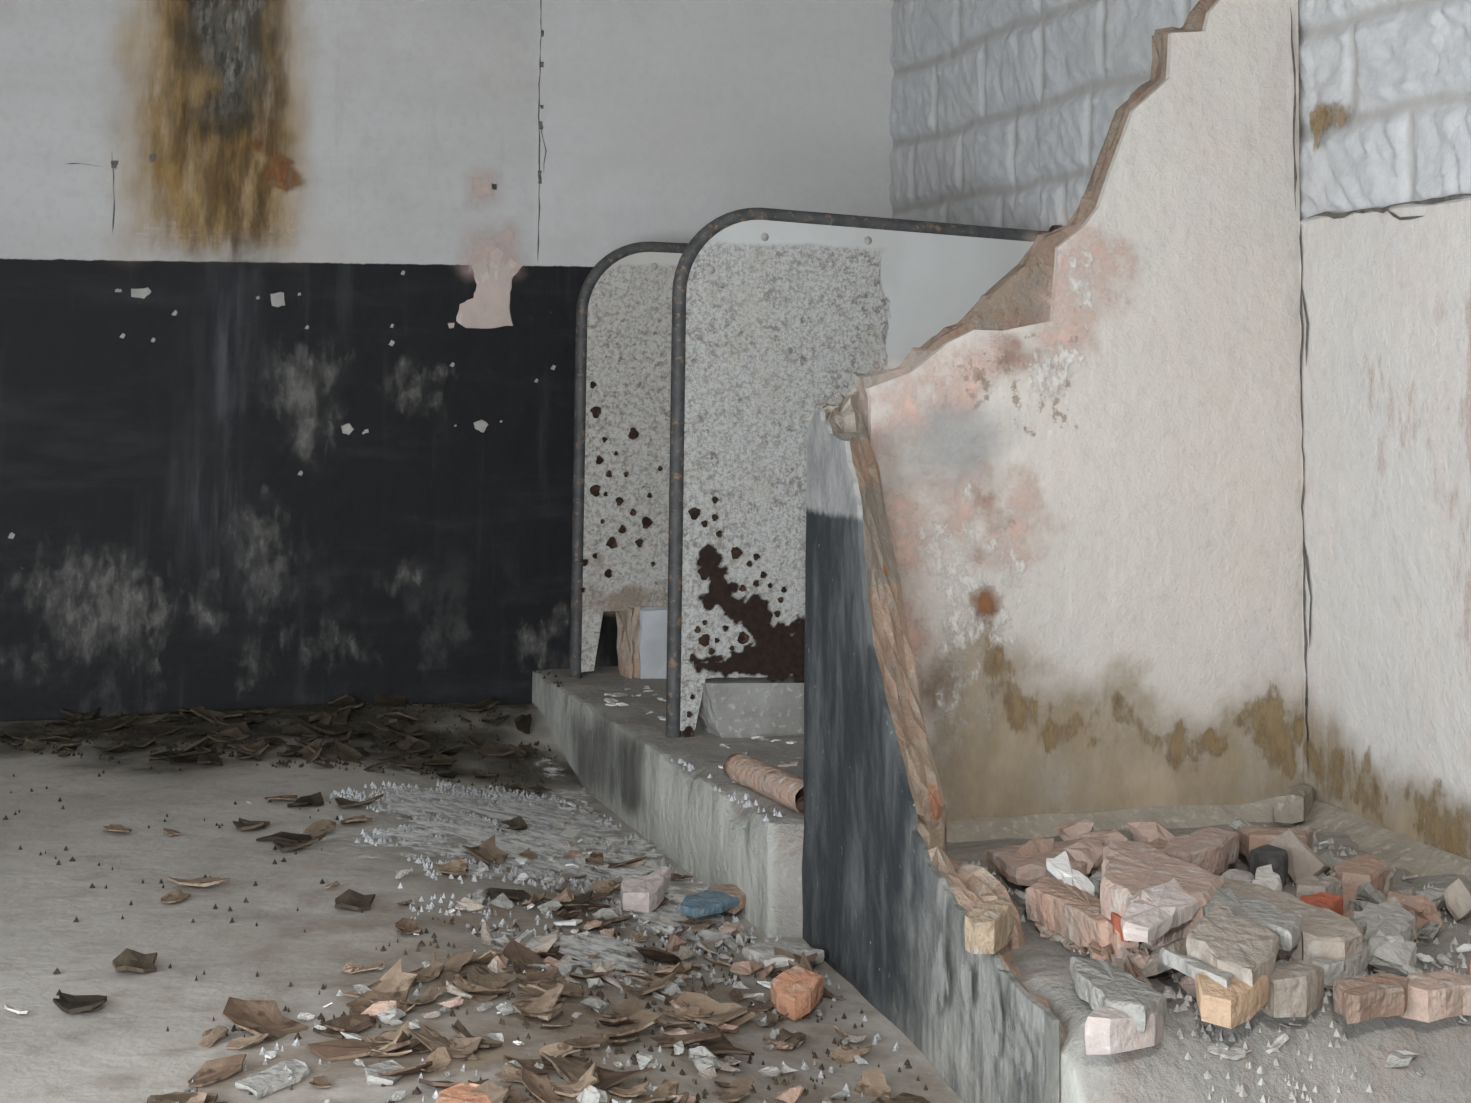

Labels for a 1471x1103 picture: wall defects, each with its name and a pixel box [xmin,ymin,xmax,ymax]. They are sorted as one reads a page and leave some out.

corrosion [144,0,301,249]
peeling [115,287,151,299]
peeling [256,292,301,307]
peeling [448,232,524,329]
corrosion [190,278,245,558]
peeling [341,423,369,435]
water stain [12,553,169,661]
water stain [191,603,216,633]
water stain [226,510,285,612]
corrosion [688,496,805,683]
corrosion [682,694,695,737]
water stain [921,627,1471,860]